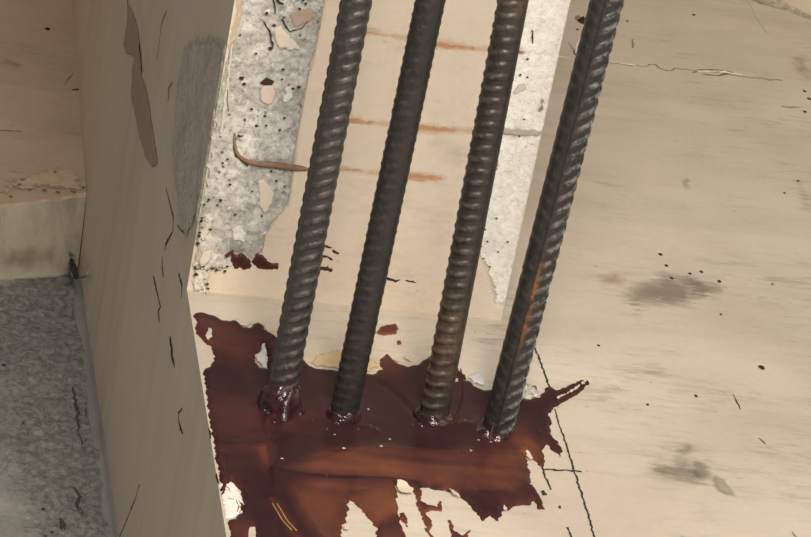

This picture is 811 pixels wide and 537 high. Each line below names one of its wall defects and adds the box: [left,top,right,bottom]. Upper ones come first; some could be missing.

spalling [193,0,324,294]
spalling [480,0,585,306]
crack [609,39,779,80]